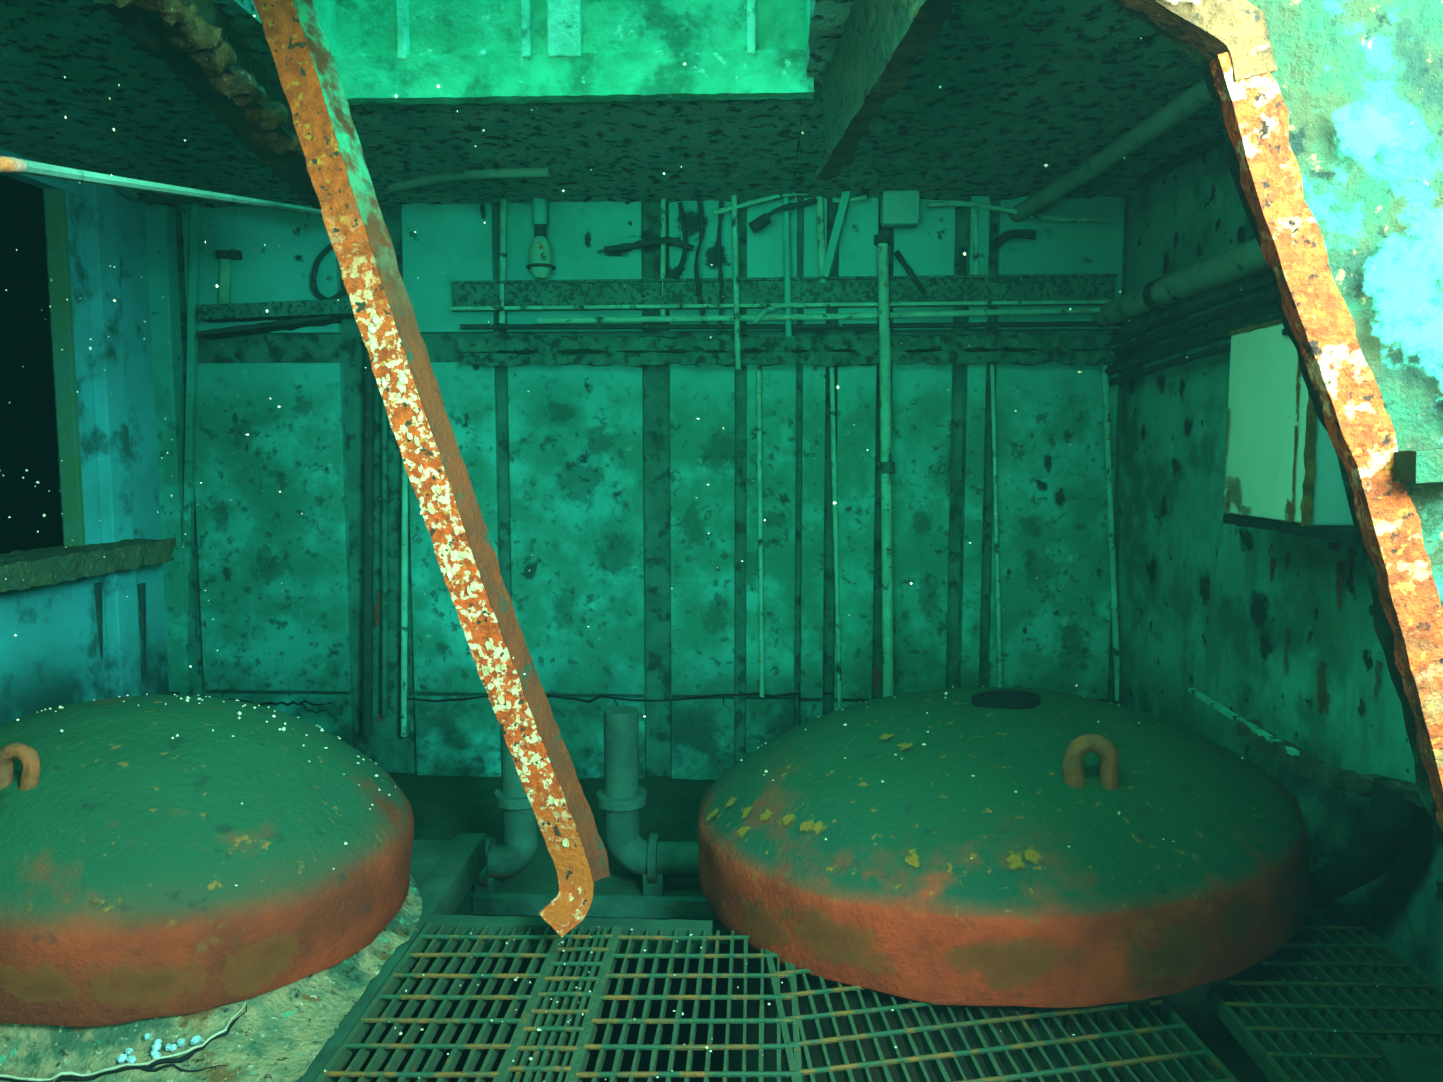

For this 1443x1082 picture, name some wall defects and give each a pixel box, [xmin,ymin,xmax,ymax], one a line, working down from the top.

damp [1249,590,1272,659]
corrosion [1317,660,1329,712]